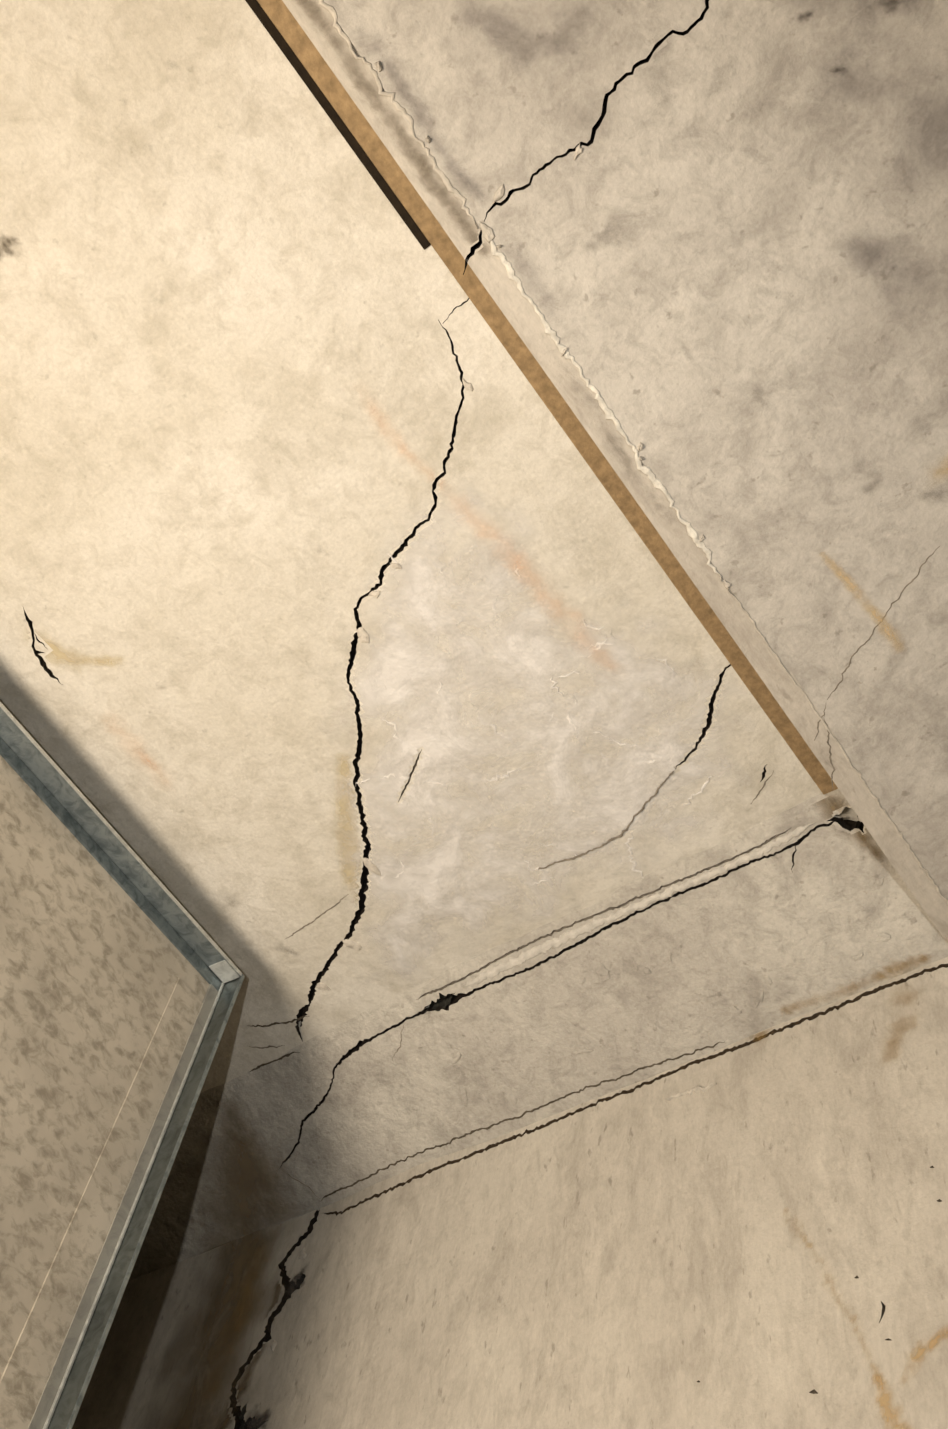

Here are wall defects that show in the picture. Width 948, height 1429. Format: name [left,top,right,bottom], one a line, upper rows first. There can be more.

crack [248,0,709,1072]
leakage [164,1111,277,1429]
crack [229,546,948,1429]